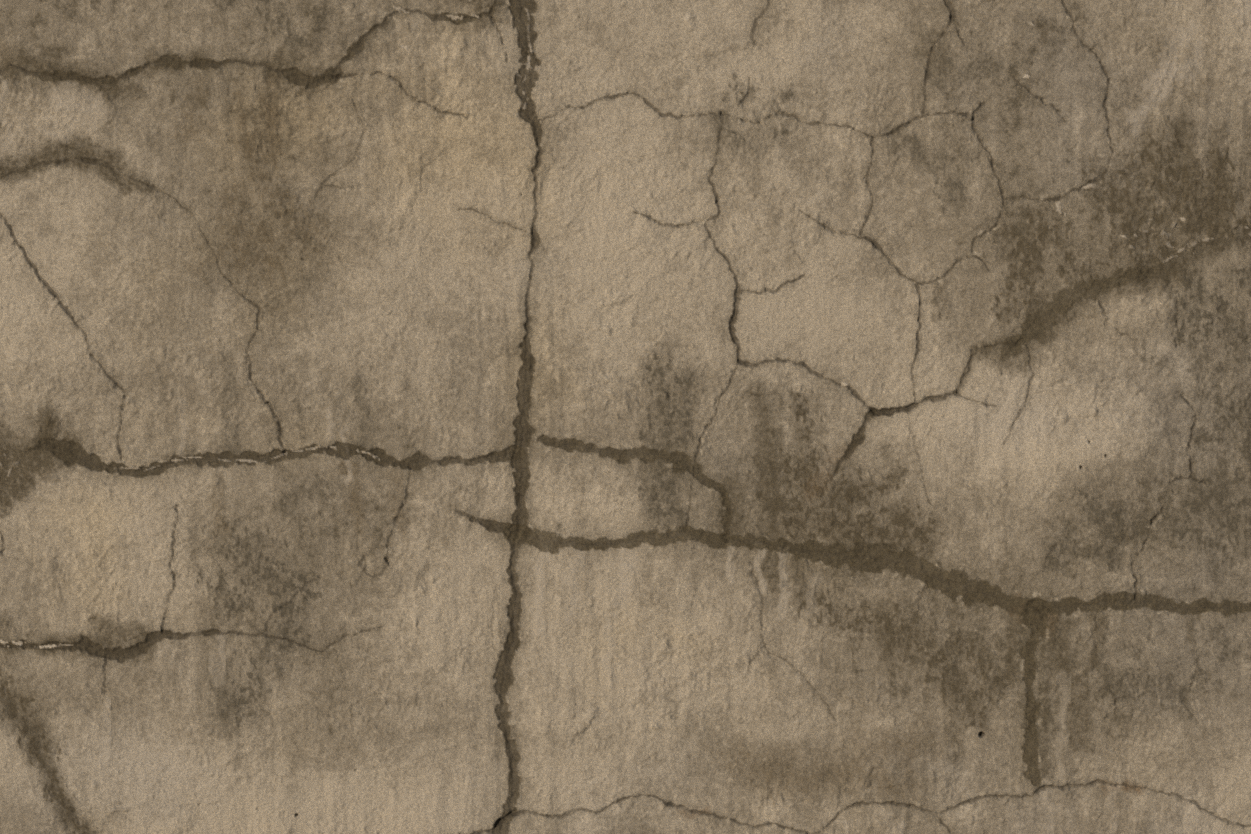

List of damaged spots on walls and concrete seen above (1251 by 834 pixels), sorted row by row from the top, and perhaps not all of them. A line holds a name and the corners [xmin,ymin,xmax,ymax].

damp [0,390,89,522]
damp [0,609,162,834]
crack [0,504,383,834]
crack [0,0,1116,579]
crack [470,157,1251,834]
damp [714,377,1021,834]
damp [928,278,958,330]
damp [969,17,1251,583]
damp [1038,611,1251,834]